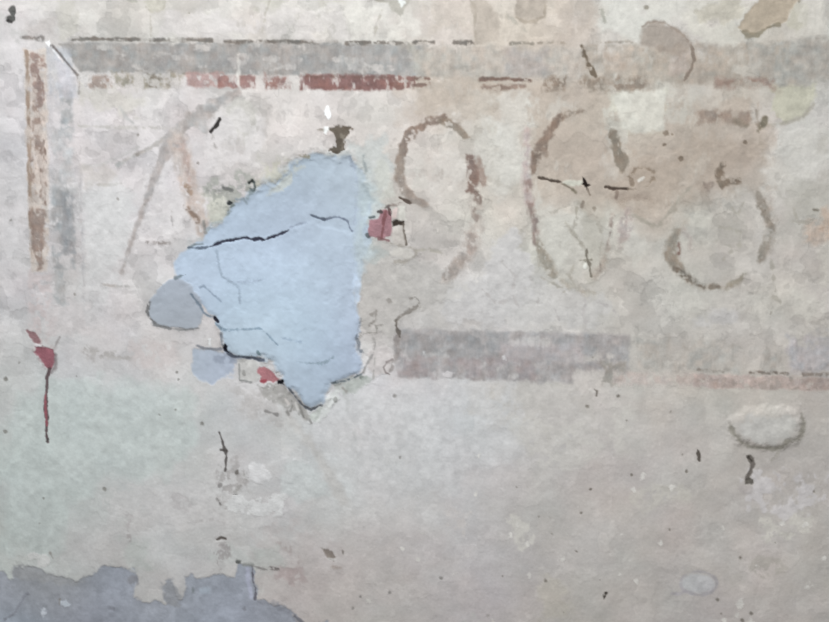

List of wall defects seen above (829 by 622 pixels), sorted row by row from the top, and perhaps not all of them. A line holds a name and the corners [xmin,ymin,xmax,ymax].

peeling [637,5,695,60]
peeling [693,0,803,40]
spalling [145,149,395,424]
crack [186,214,354,367]
flaking render [25,328,61,375]
crack [276,378,323,412]
crack [215,430,248,507]
peeling [0,551,306,622]